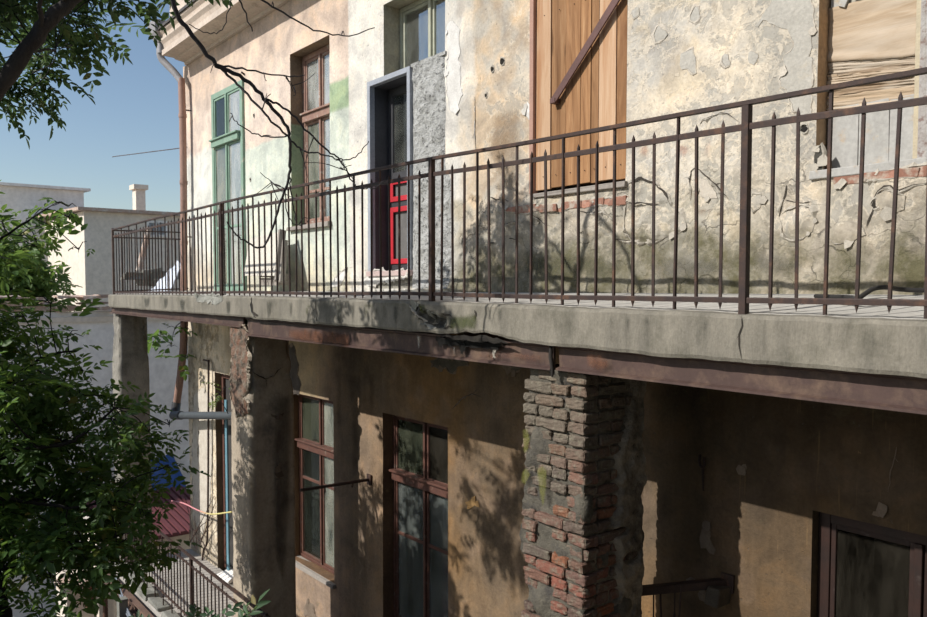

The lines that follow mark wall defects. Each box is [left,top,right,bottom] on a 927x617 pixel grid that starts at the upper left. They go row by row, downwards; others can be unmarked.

peeling [719,53,731,69]
peeling [756,0,817,115]
crack [688,168,728,200]
crack [777,185,811,215]
crack [866,183,926,227]
spalling [409,299,452,329]
flaking render [229,324,252,418]
peeling [289,343,301,395]